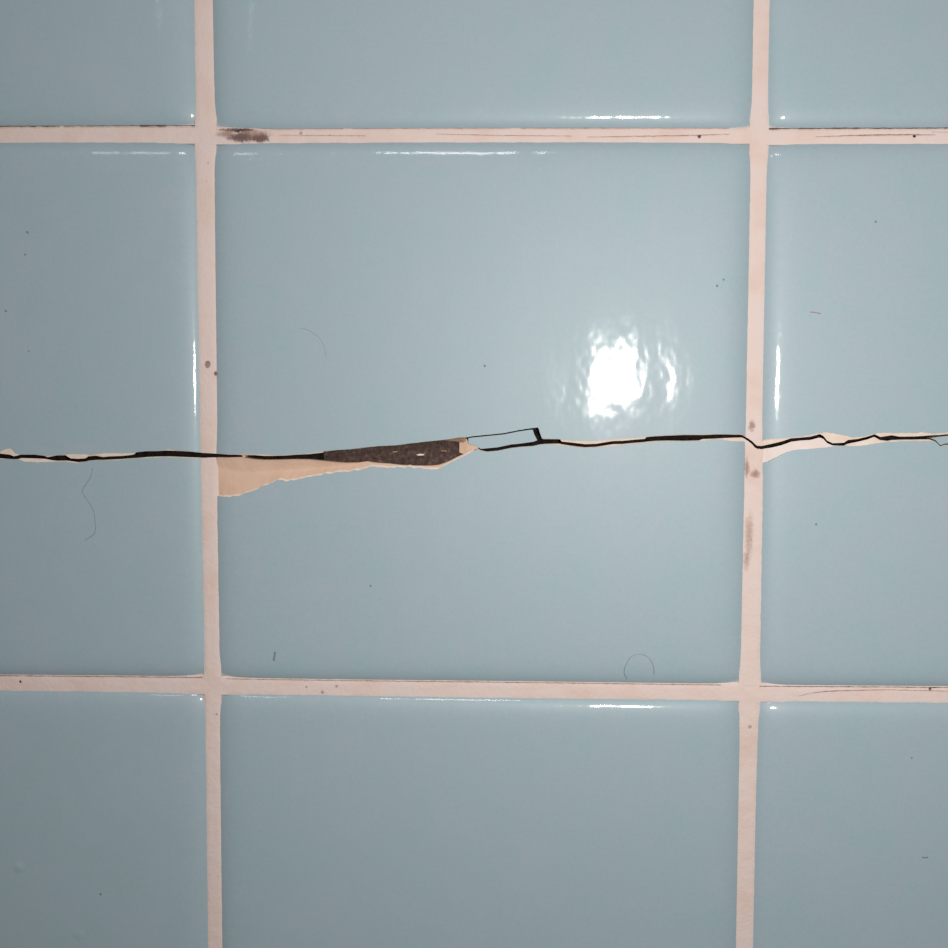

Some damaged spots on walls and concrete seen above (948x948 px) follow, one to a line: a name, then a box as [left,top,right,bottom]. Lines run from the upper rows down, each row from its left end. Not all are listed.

spalling [217,450,474,497]
crack [0,427,948,539]